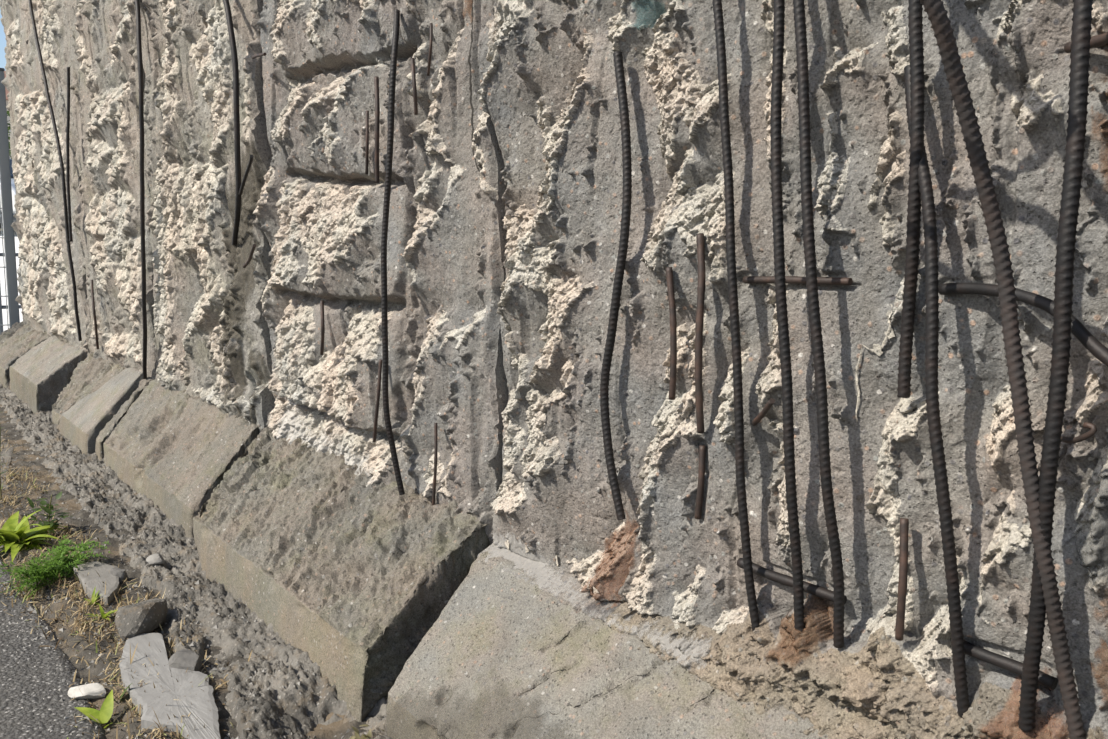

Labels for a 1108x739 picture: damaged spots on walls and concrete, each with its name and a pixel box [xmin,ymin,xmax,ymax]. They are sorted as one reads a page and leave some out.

spalling [12,91,77,336]
spalling [76,0,271,420]
spalling [267,0,735,515]
spalling [760,0,787,163]
spalling [814,112,851,231]
spalling [820,5,910,88]
spalling [867,112,906,245]
spalling [1010,74,1065,129]
corrosion [1094,113,1108,174]
spalling [1074,358,1108,426]
spalling [485,278,1052,739]
corrosion [768,597,834,662]